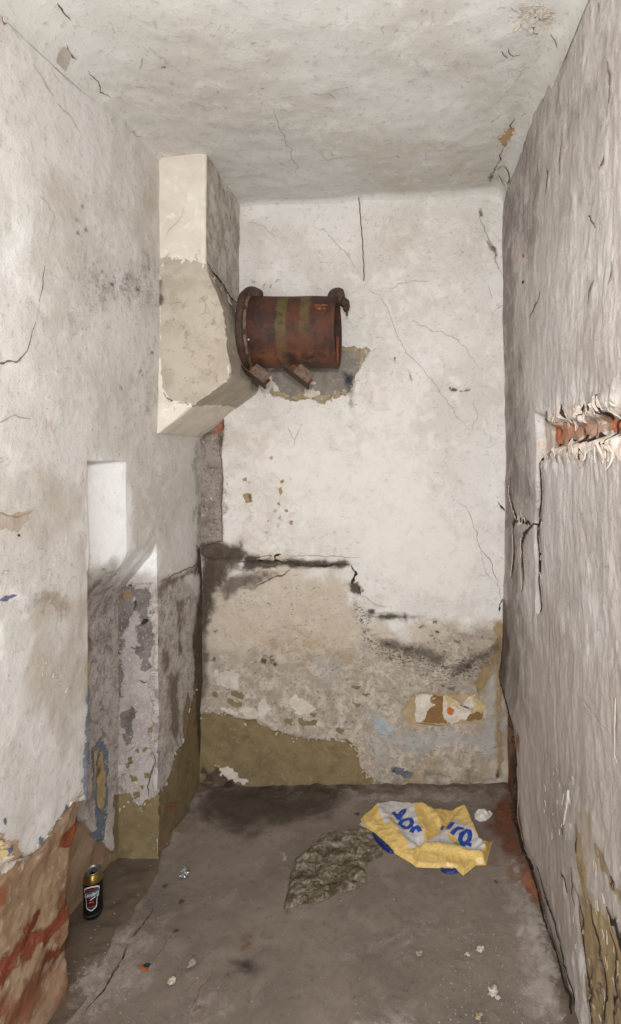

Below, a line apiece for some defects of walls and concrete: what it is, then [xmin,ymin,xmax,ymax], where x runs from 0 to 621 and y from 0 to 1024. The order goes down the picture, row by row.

crack [33,46,111,132]
crack [0,267,45,364]
spalling [159,249,377,410]
crack [315,227,478,424]
peeling [0,510,33,532]
leakage [222,559,349,598]
crack [236,554,383,607]
crack [465,477,538,612]
spalling [537,394,621,613]
spalling [0,583,486,1024]
leakage [201,765,339,828]